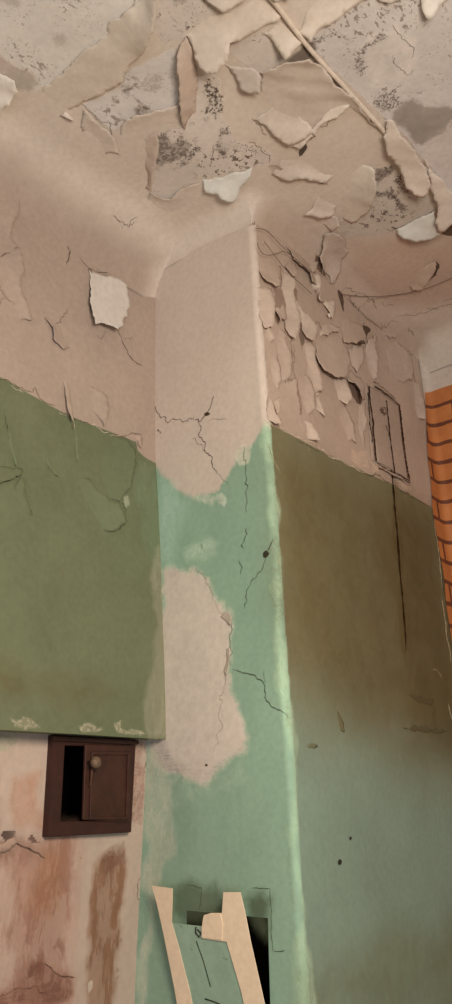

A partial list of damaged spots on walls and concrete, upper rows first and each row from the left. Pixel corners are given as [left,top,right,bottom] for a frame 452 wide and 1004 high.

peeling [0,0,452,447]
crack [155,396,451,657]
peeling [116,568,246,784]
crack [233,669,287,715]